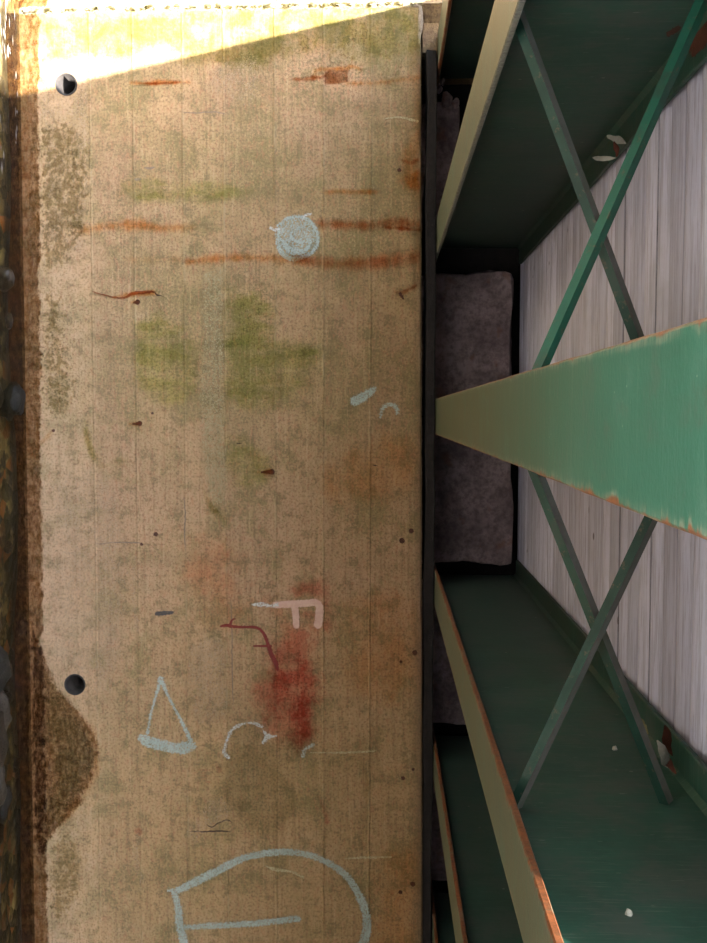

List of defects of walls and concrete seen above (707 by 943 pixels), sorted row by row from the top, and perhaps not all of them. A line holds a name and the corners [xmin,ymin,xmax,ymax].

damp [5,0,98,943]